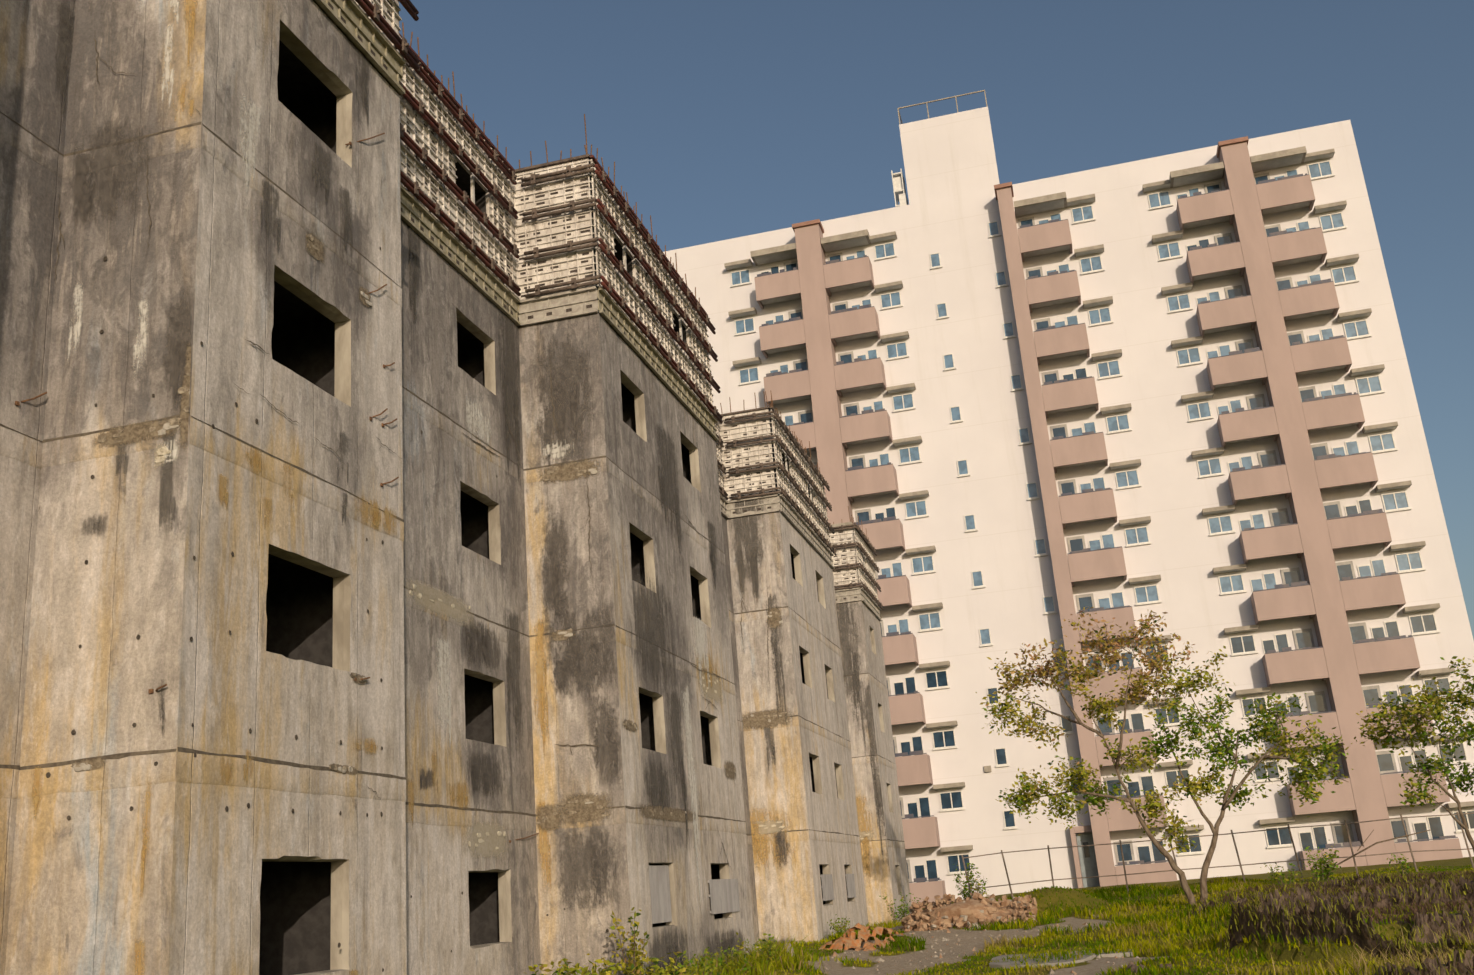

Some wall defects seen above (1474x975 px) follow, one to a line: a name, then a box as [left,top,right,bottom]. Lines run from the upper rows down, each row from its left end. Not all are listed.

efflorescence [162,0,179,103]
leakage [68,285,83,356]
leakage [134,301,147,368]
leakage [164,300,191,409]
spalling [97,346,191,465]
leakage [159,430,177,525]
rust [219,474,228,506]
leakage [733,499,776,610]
leakage [542,516,709,905]
leakage [763,727,776,770]
leakage [771,627,787,717]
spalling [536,794,610,830]